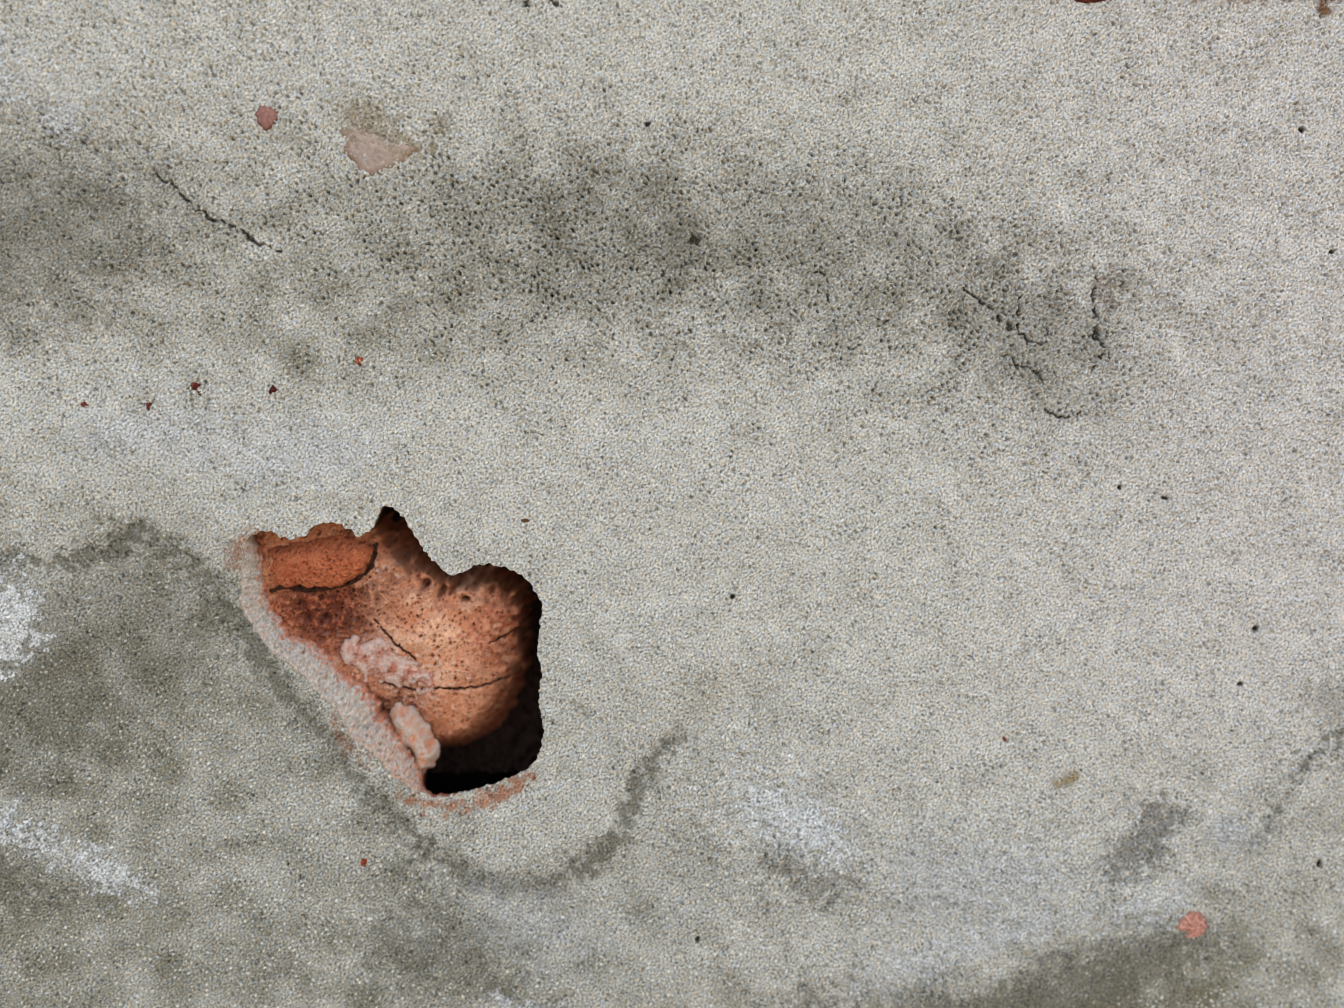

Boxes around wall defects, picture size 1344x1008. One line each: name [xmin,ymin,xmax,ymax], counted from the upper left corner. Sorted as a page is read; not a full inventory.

spalling [238,505,544,799]